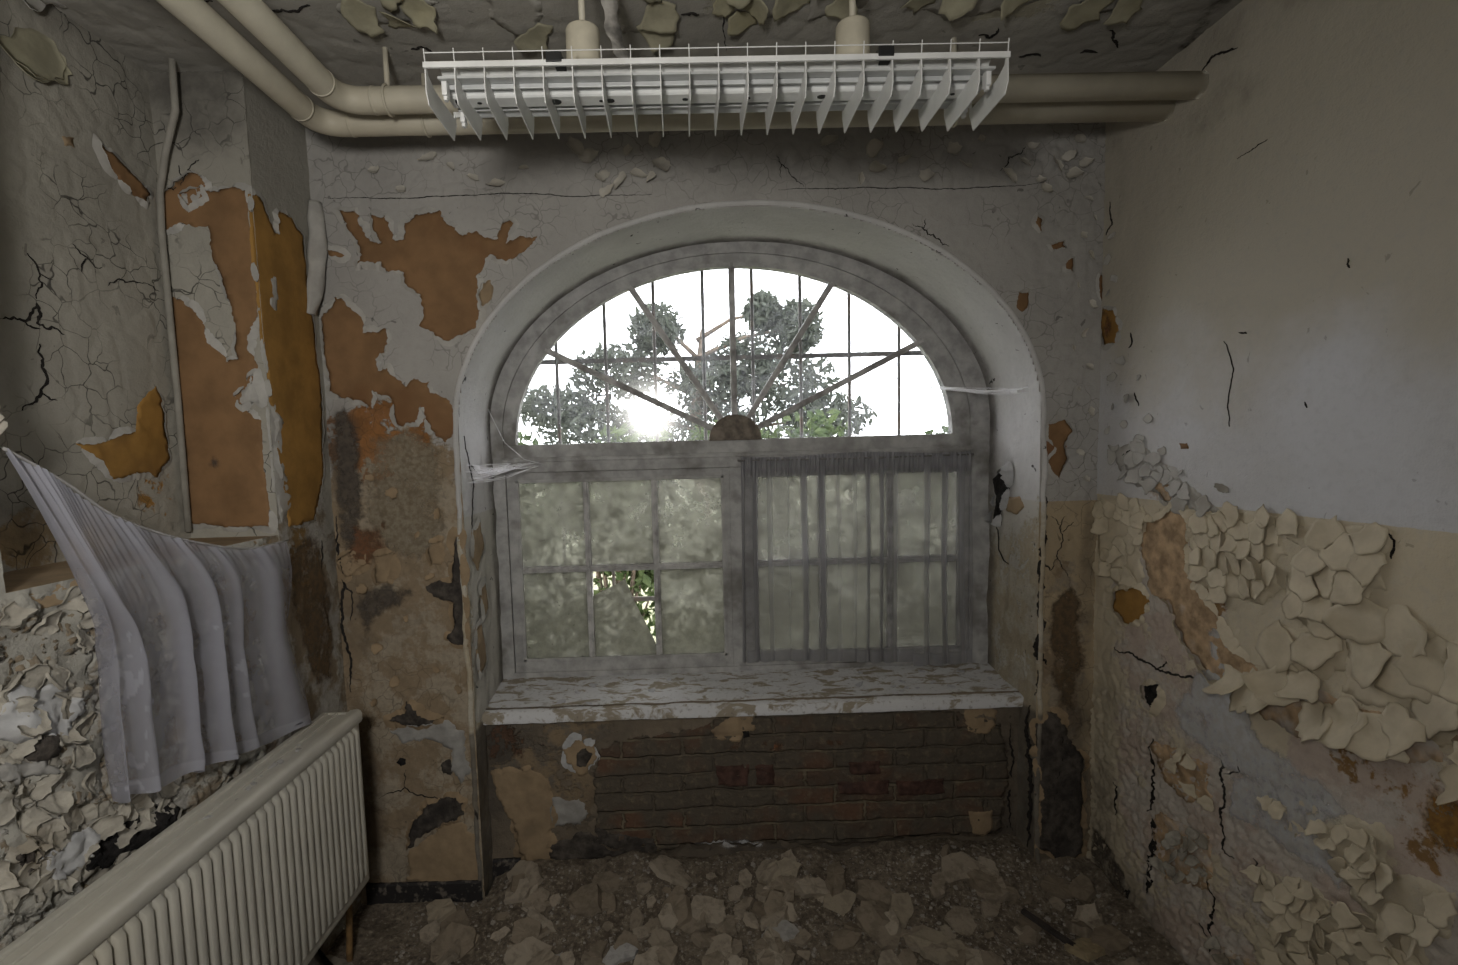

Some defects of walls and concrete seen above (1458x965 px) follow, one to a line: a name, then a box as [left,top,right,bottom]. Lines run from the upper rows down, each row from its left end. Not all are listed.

crack [0,244,158,411]
peeling [75,133,537,534]
peeling [0,406,8,435]
flaking render [336,546,401,586]
flaking render [426,516,489,680]
peeling [1090,232,1458,813]
flaking render [0,586,183,942]
flaking render [383,700,482,882]
flaking render [491,708,1014,861]
flaking render [1029,707,1090,859]
peeling [1149,812,1213,890]
peeling [1203,792,1458,965]